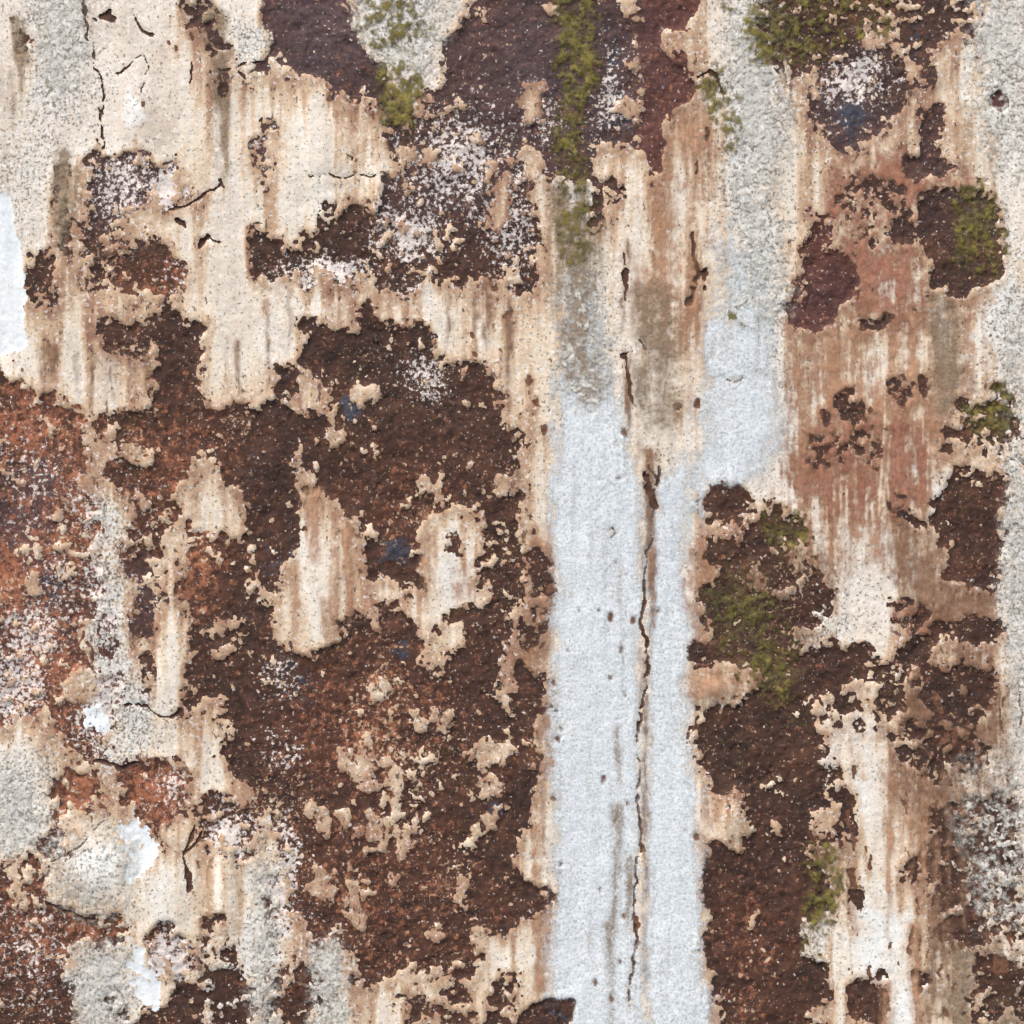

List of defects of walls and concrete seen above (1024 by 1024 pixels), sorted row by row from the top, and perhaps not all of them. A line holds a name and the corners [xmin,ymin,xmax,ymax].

crack [81,0,155,150]
crack [168,178,225,211]
peeling [95,289,128,322]
crack [620,339,647,358]
corrosion [0,0,718,1024]
corrosion [684,0,1024,1024]
crack [627,466,661,1007]
peeling [115,817,215,1012]